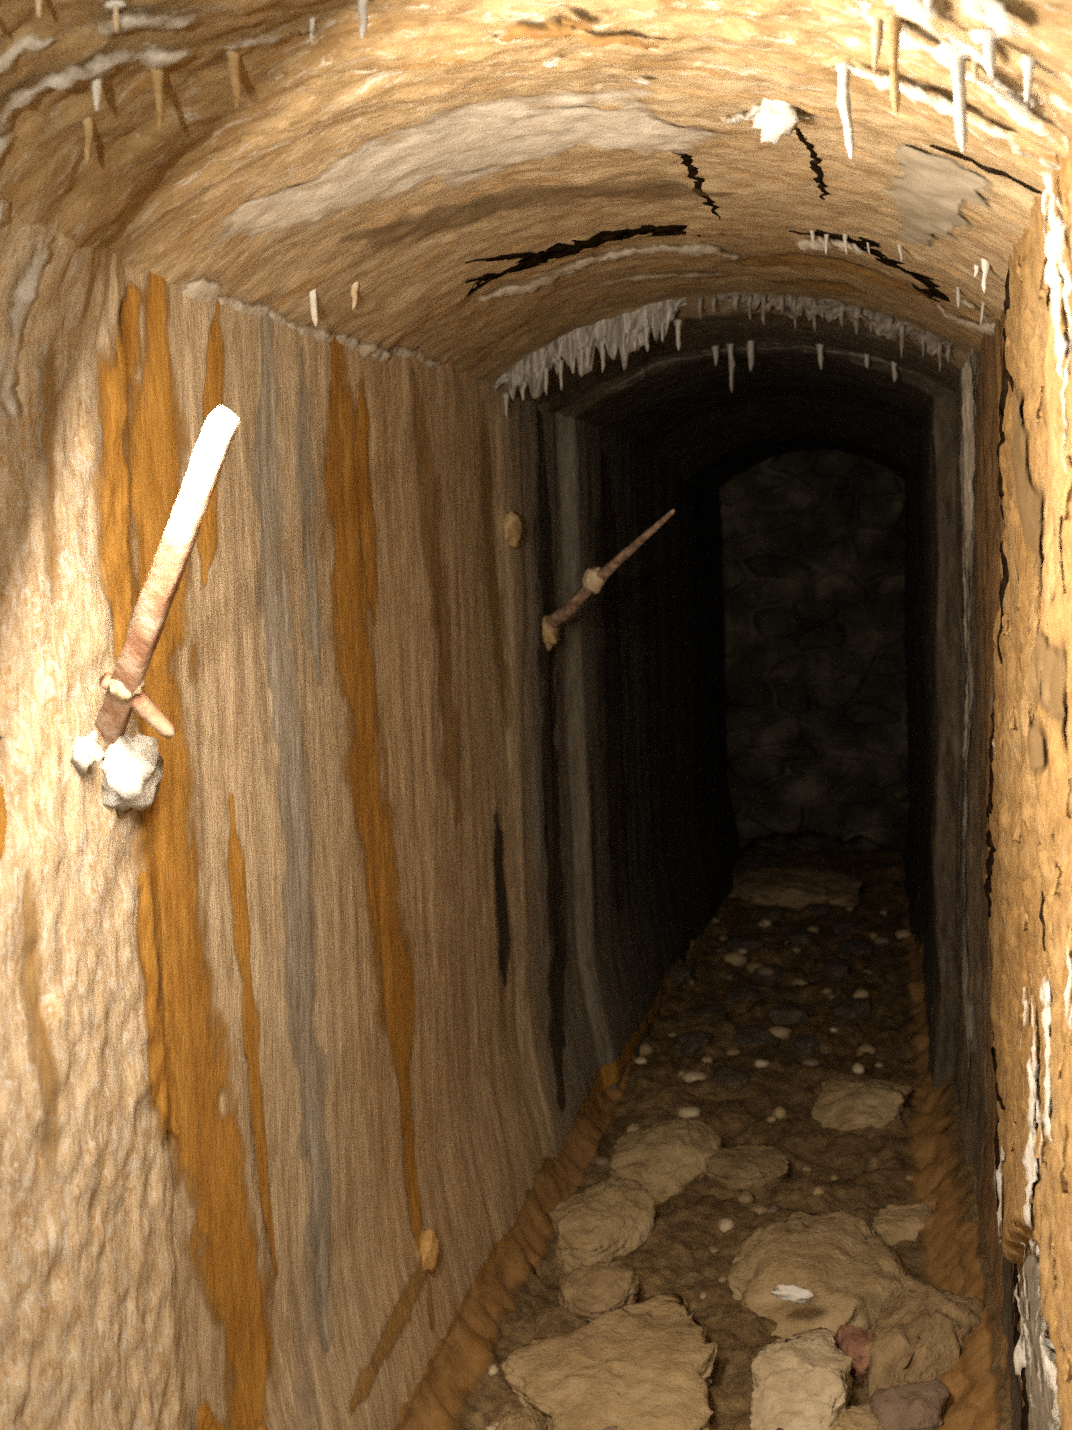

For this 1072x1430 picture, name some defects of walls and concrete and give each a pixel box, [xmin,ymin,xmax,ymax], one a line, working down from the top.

water stain [98,15,194,36]
water stain [0,21,335,157]
crack [464,151,725,297]
crack [789,128,949,302]
water stain [847,0,1072,472]
rust [41,333,57,600]
crack [997,268,1019,664]
rust [23,868,60,1154]
rust [71,272,277,1430]
rust [323,331,701,1430]
crack [984,707,996,918]
flaking render [984,135,1072,1430]